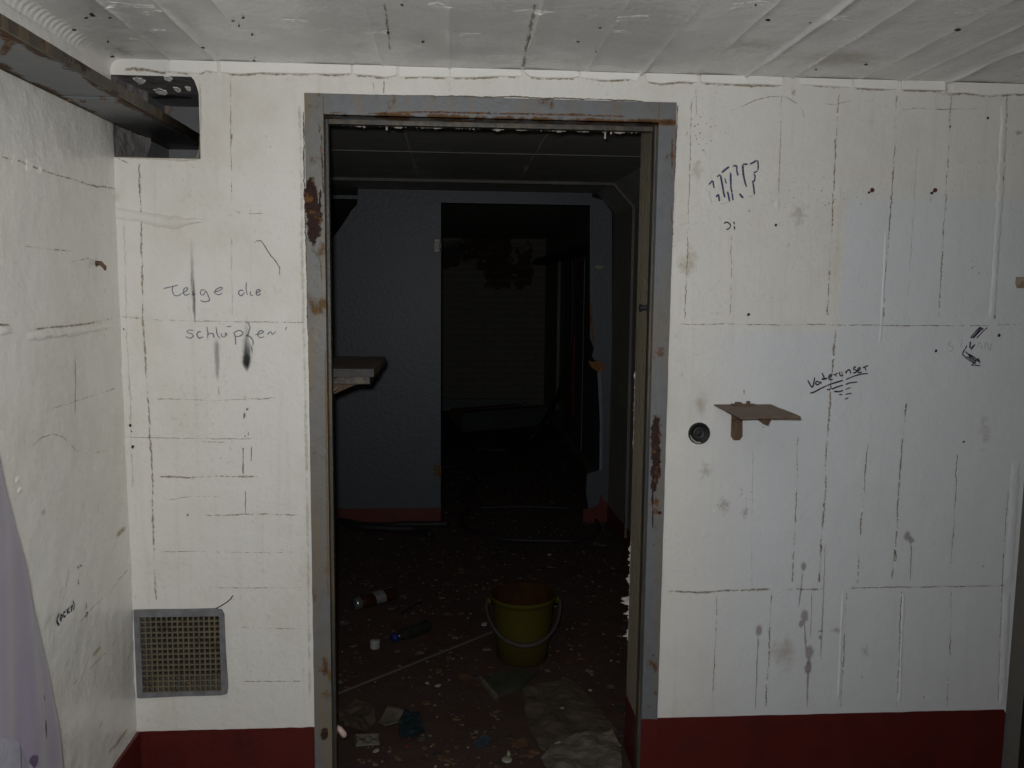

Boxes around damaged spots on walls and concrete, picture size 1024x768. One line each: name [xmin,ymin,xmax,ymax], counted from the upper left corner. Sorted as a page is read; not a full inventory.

rust [303,125,324,246]
rust [650,416,662,528]
peeling [621,541,631,640]